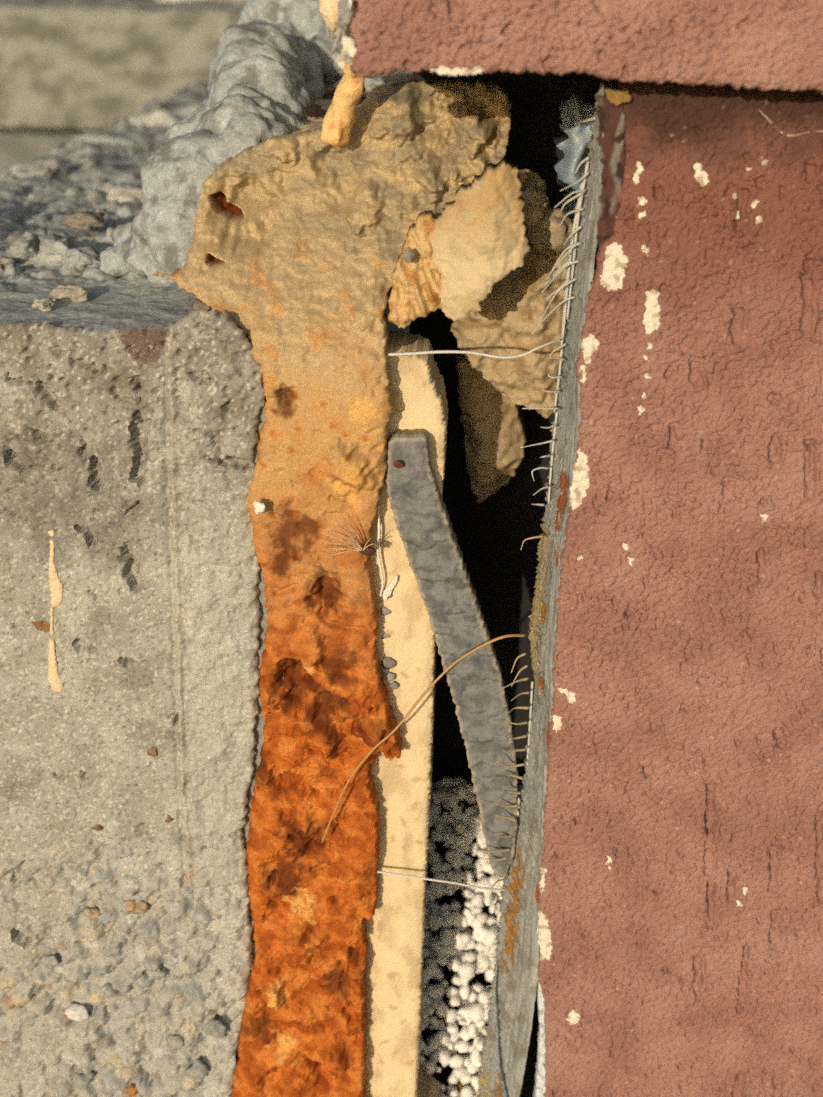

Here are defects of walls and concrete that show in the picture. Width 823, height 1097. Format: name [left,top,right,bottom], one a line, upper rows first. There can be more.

peeling [579,334,600,383]
peeling [570,448,590,510]
peeling [558,688,576,704]
peeling [553,715,563,733]
peeling [540,866,548,894]
peeling [537,910,553,960]
crack [495,961,546,1097]
peeling [566,1010,581,1025]